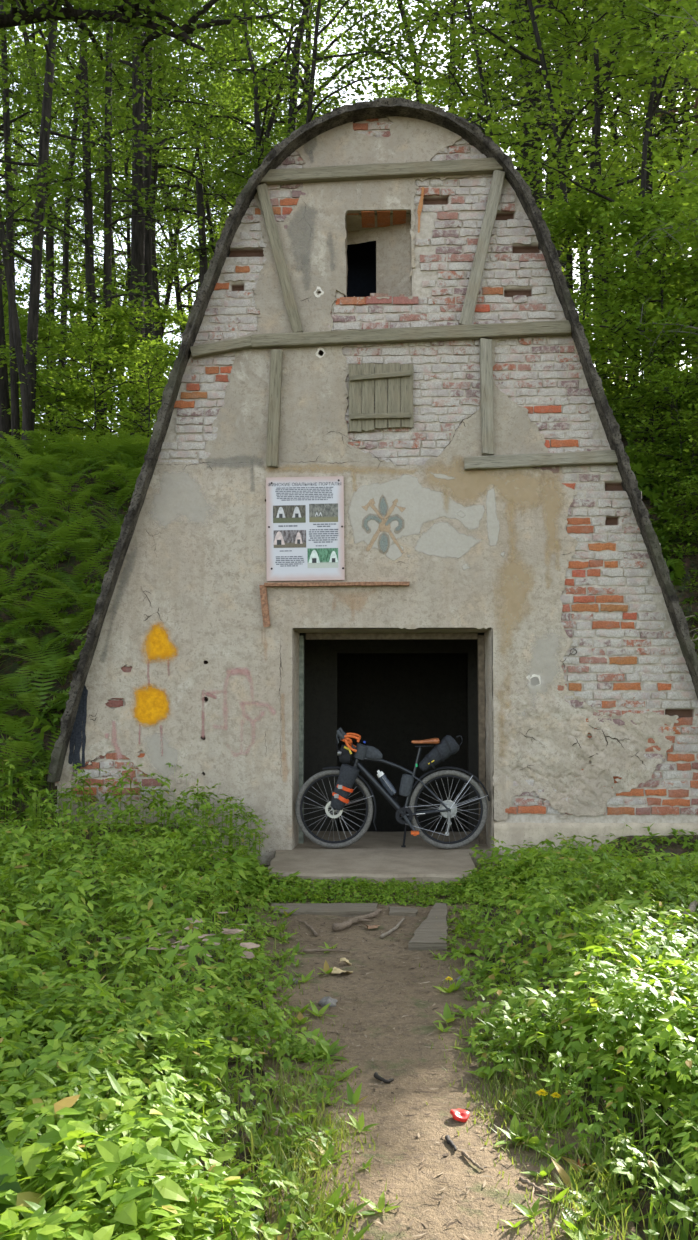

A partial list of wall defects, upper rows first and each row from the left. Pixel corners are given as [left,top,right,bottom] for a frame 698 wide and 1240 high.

spalling [276,151,308,169]
spalling [431,138,486,161]
spalling [158,183,306,467]
spalling [314,174,563,331]
damp [428,461,560,642]
spalling [342,335,698,819]
spalling [55,735,177,805]